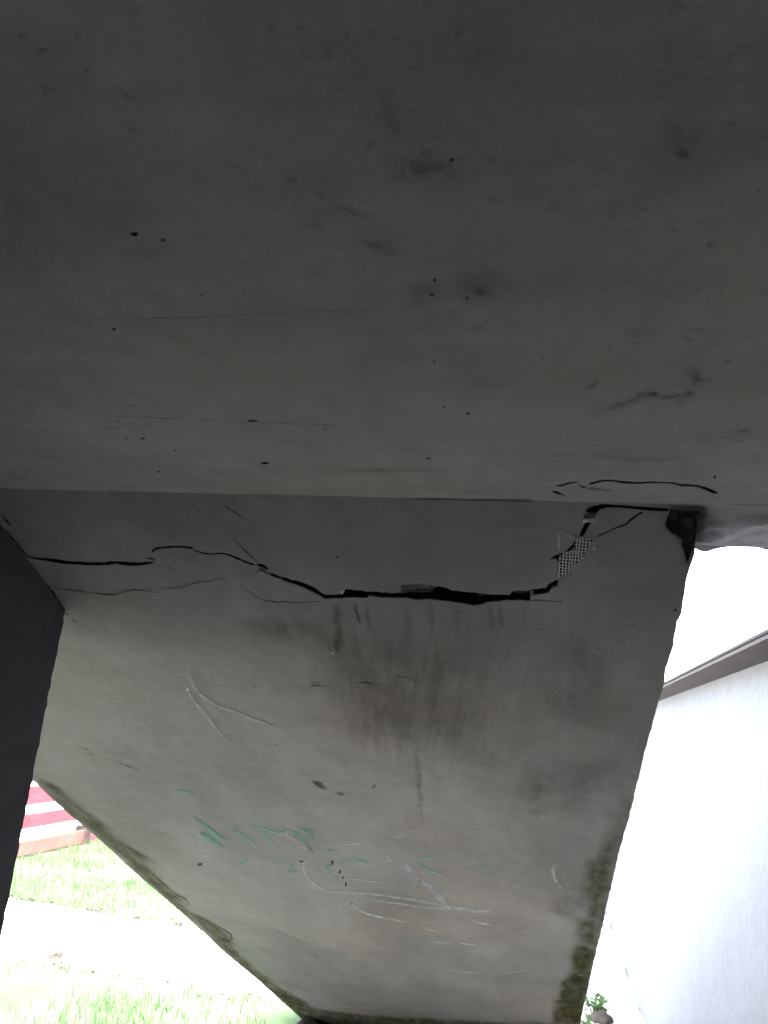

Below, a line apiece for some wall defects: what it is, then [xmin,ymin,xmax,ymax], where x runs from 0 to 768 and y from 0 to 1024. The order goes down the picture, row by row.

crack [2,480,718,615]